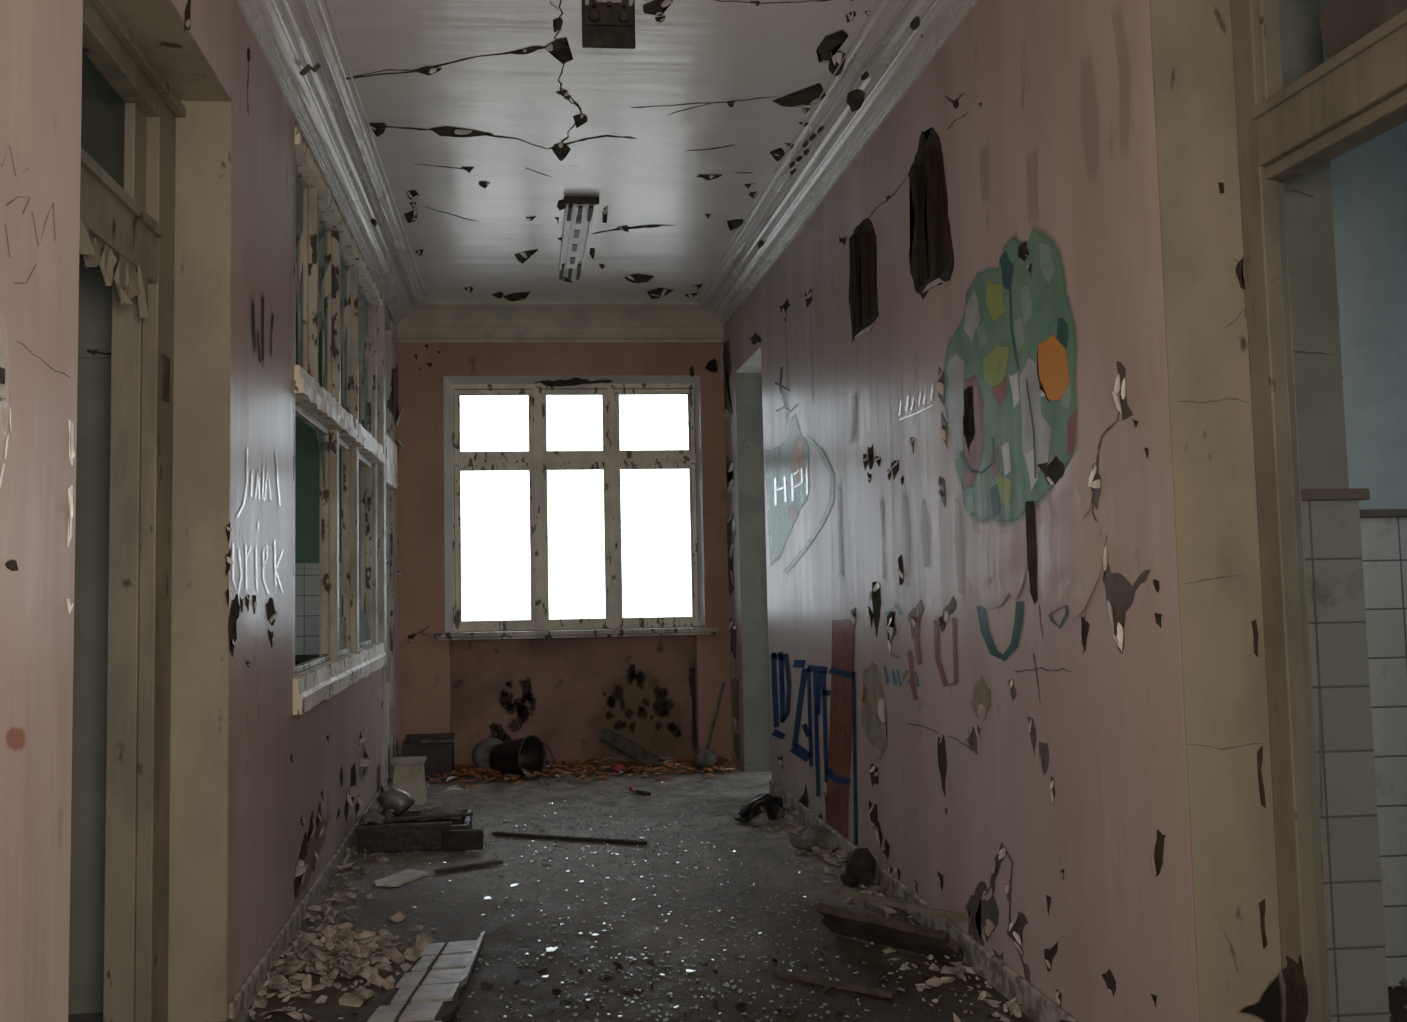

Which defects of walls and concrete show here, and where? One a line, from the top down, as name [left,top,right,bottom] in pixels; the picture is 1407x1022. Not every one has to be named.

peeling [643,0,673,23]
crack [715,0,853,8]
crack [346,0,777,188]
peeling [770,11,871,175]
crack [592,224,675,234]
crack [839,173,909,245]
peeling [0,309,12,487]
peeling [5,559,18,571]
mould [489,678,537,743]
damp [598,664,681,755]
peeling [294,731,373,898]
peeling [964,843,1058,984]